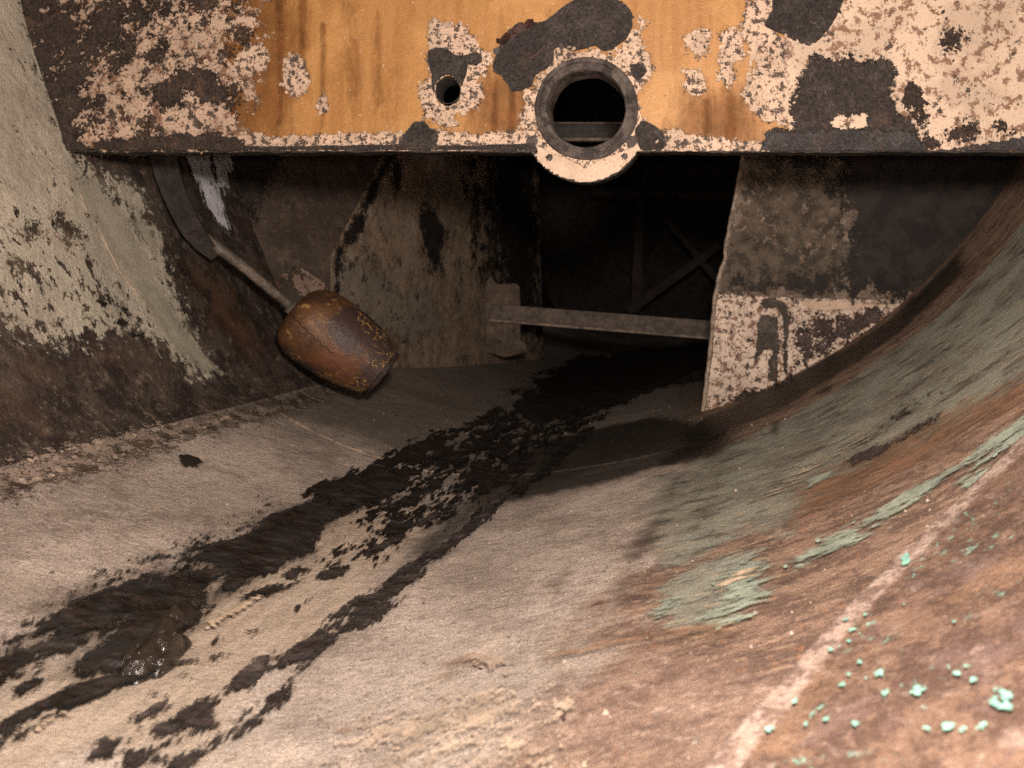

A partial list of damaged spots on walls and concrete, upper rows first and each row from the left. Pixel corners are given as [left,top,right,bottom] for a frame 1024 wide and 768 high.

peeling [6,253,34,284]
peeling [8,206,85,251]
peeling [21,0,1024,353]
peeling [706,293,903,410]
leakage [0,228,961,768]